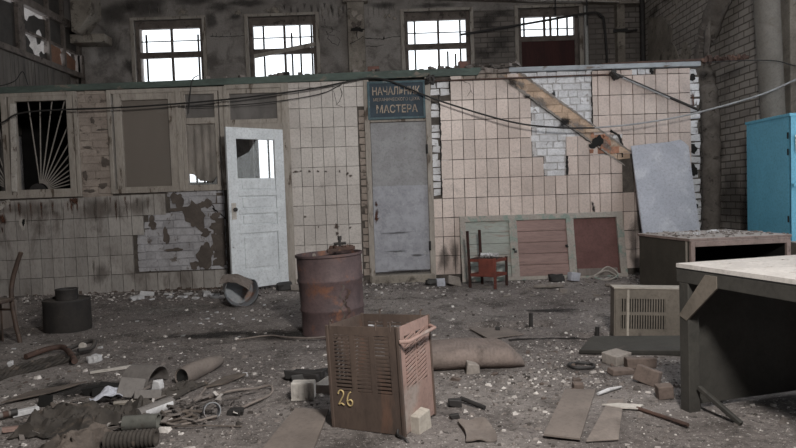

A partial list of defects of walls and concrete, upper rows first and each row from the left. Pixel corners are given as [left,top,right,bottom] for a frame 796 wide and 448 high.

flaking render [430,78,451,196]
flaking render [498,70,632,176]
flaking render [137,190,228,272]